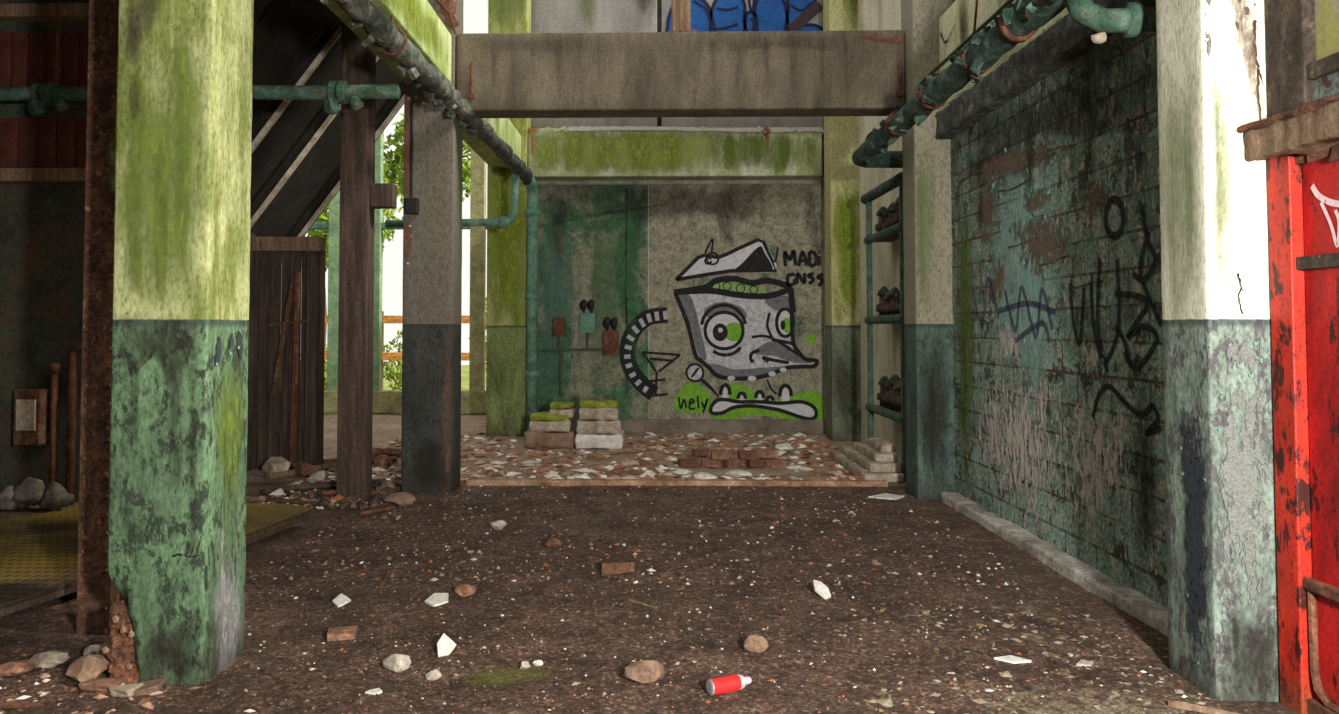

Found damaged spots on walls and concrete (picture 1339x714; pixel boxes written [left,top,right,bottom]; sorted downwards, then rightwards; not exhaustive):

water stain [129,47,192,287]
peeling [956,142,1073,301]
peeling [216,329,243,366]
peeling [971,321,1134,540]
water stain [1234,624,1272,692]